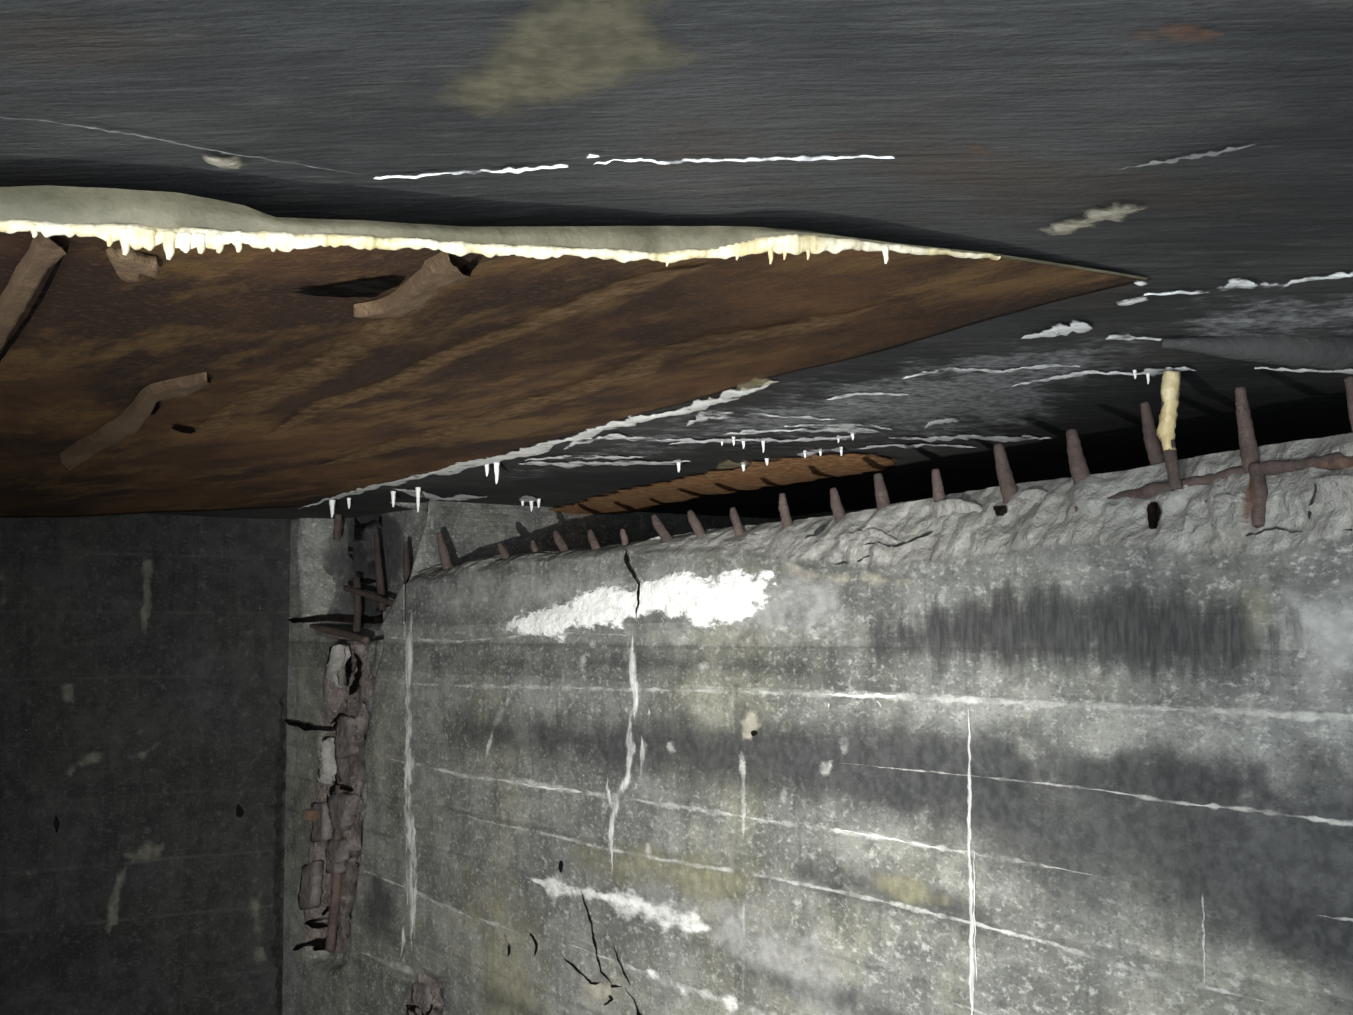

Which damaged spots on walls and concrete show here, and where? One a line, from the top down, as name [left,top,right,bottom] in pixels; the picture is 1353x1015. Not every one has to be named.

crack [1,117,895,179]
leakage [0,219,1001,266]
crack [0,185,1353,296]
leakage [300,296,1353,518]
spalling [402,371,1353,584]
crack [619,546,640,614]
spalling [284,532,394,953]
leakage [383,621,433,973]
leakage [439,562,834,867]
spalling [404,970,443,1015]
crack [504,890,641,1015]
leakage [532,878,740,941]